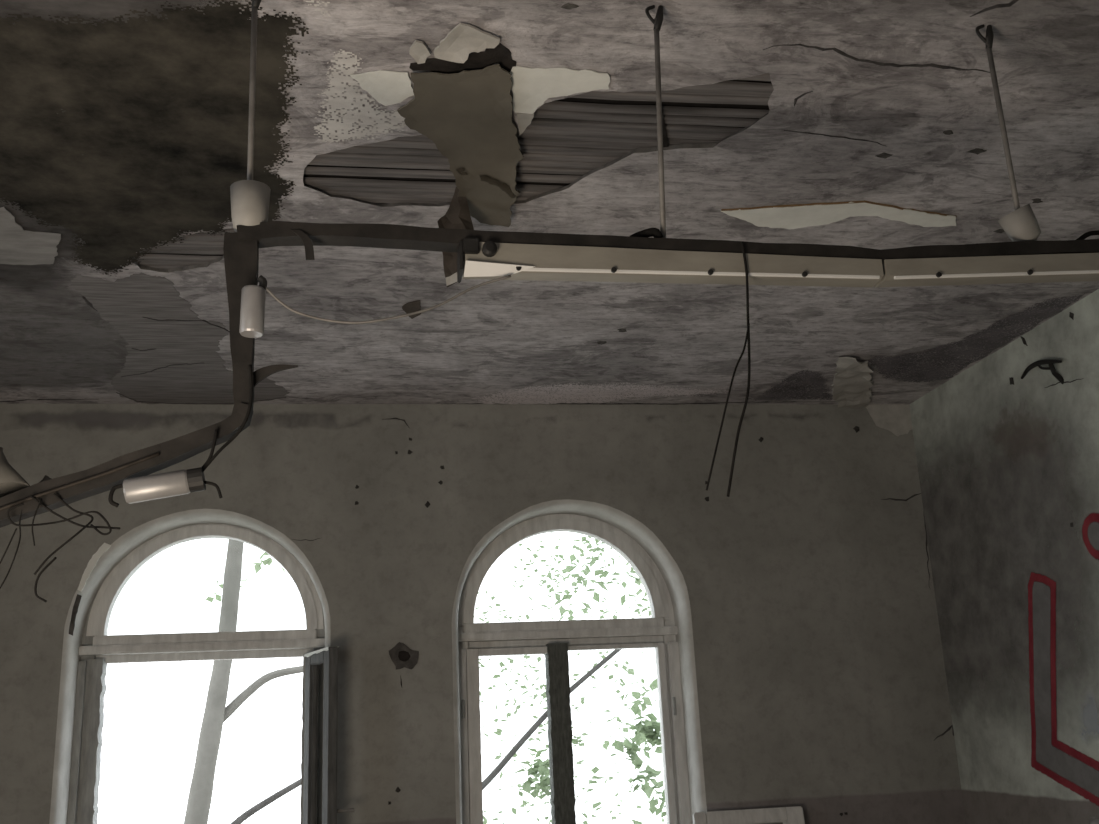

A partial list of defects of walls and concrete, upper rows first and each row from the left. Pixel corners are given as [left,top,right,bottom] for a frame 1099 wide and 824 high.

crack [763,44,990,73]
leakage [0,0,310,276]
flaking render [303,23,774,230]
peeling [0,207,61,265]
peeling [721,200,957,229]
flaking render [442,252,463,287]
flaking render [68,228,236,404]
flaking render [254,378,290,402]
leakage [918,433,1090,704]